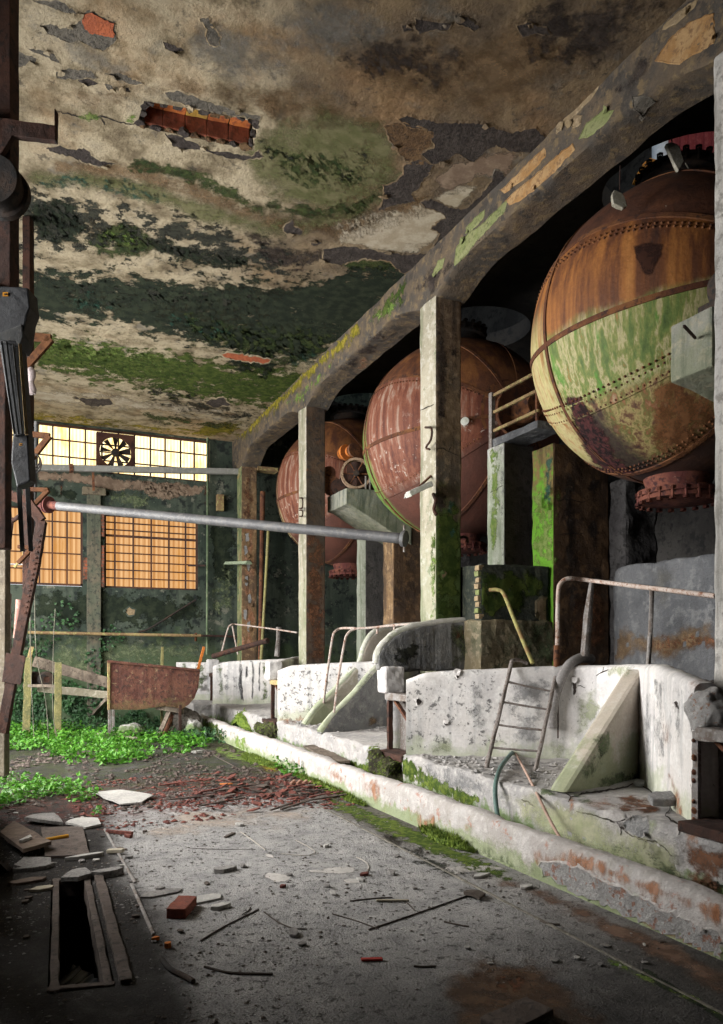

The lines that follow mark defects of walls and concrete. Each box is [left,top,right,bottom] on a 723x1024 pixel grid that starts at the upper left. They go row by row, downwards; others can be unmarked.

spalling [19,0,144,95]
water stain [341,0,664,119]
peeling [655,0,715,65]
spalling [134,88,264,162]
spalling [282,86,614,277]
water stain [19,153,516,371]
water stain [436,326,457,417]
corrosion [615,628,715,658]
corrosion [536,852,662,903]
crack [562,783,680,856]
corrosion [688,835,723,891]
corrosion [533,891,723,991]